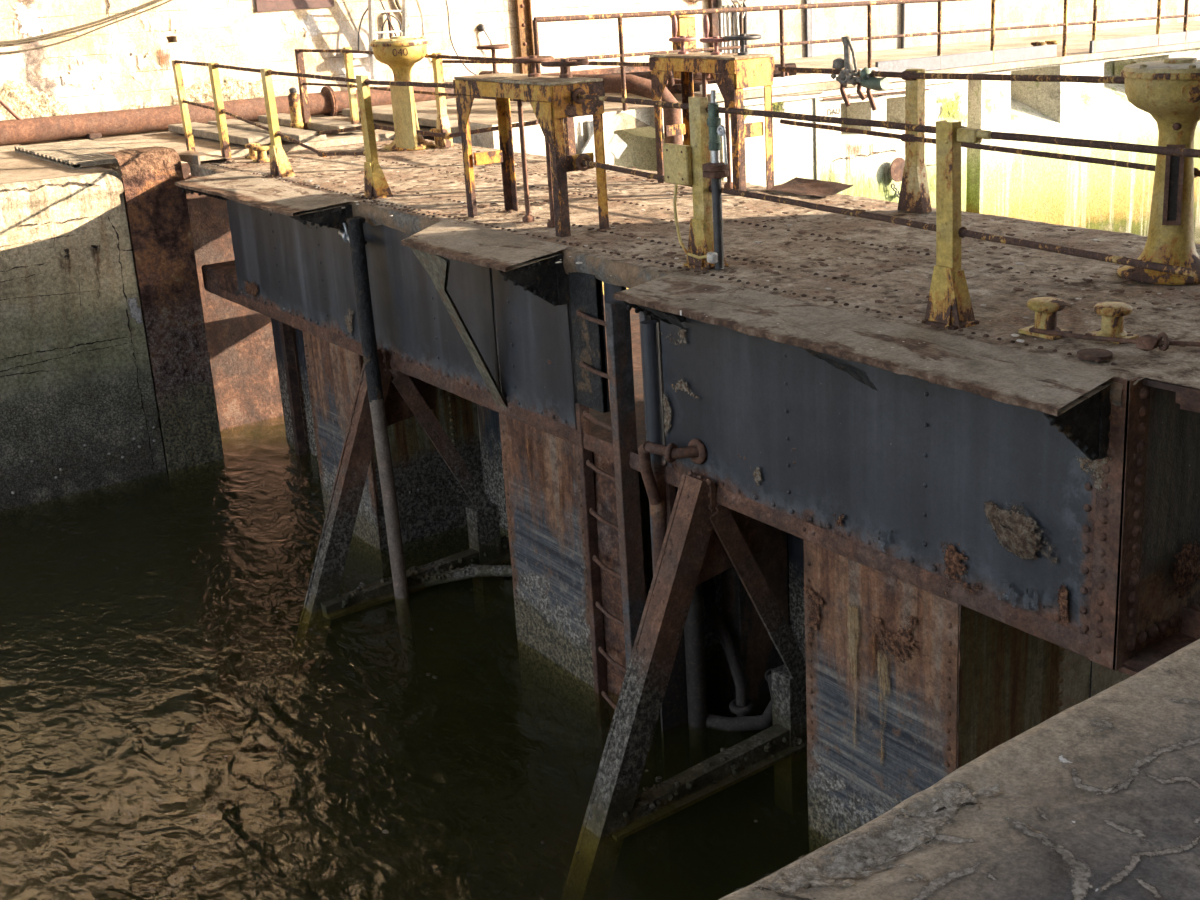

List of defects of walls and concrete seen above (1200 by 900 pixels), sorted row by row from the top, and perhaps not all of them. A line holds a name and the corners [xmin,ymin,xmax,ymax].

damp [17,0,58,116]
rust [984,501,1057,564]
rust [847,604,890,716]
crack [1006,737,1200,900]